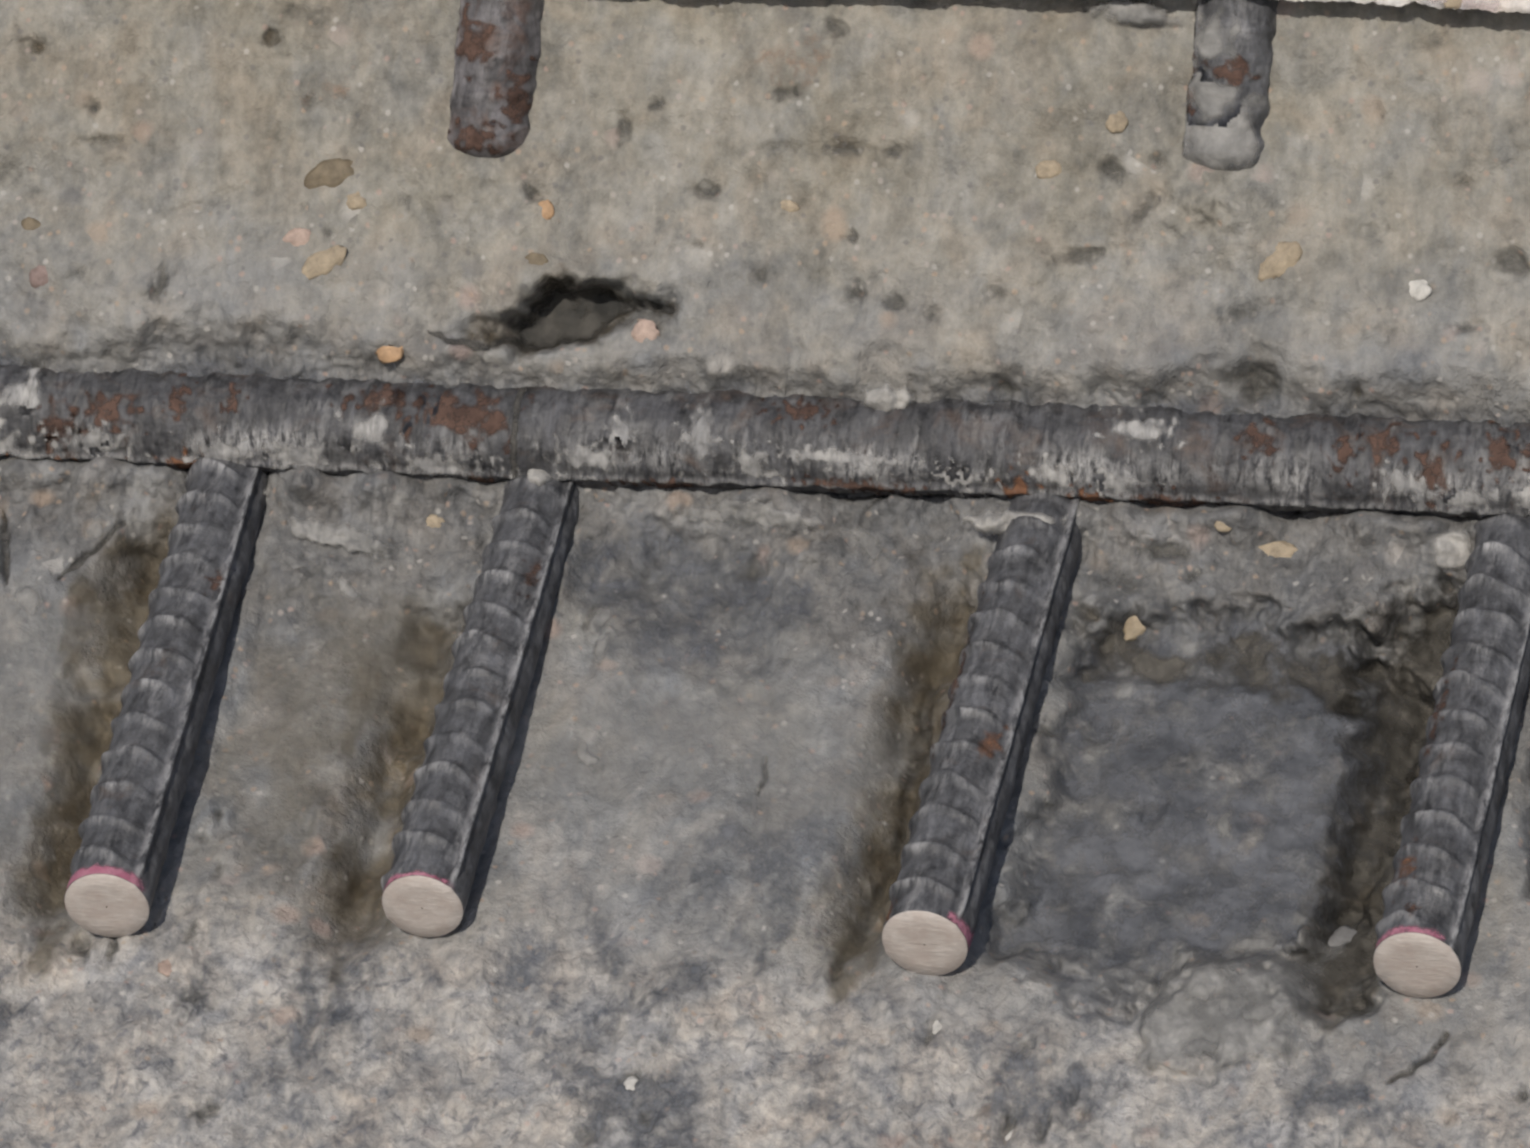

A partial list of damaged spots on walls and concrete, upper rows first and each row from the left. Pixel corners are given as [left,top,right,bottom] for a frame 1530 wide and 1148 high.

rust [455,2,495,81]
rust [447,56,535,155]
rust [1186,52,1261,116]
spalling [428,276,675,353]
rust [27,391,144,461]
rust [326,383,510,454]
rust [605,477,713,489]
rust [1067,484,1225,507]
rust [1329,422,1461,509]
rust [1479,420,1530,487]
spalling [335,578,358,599]
spalling [1081,584,1459,1072]